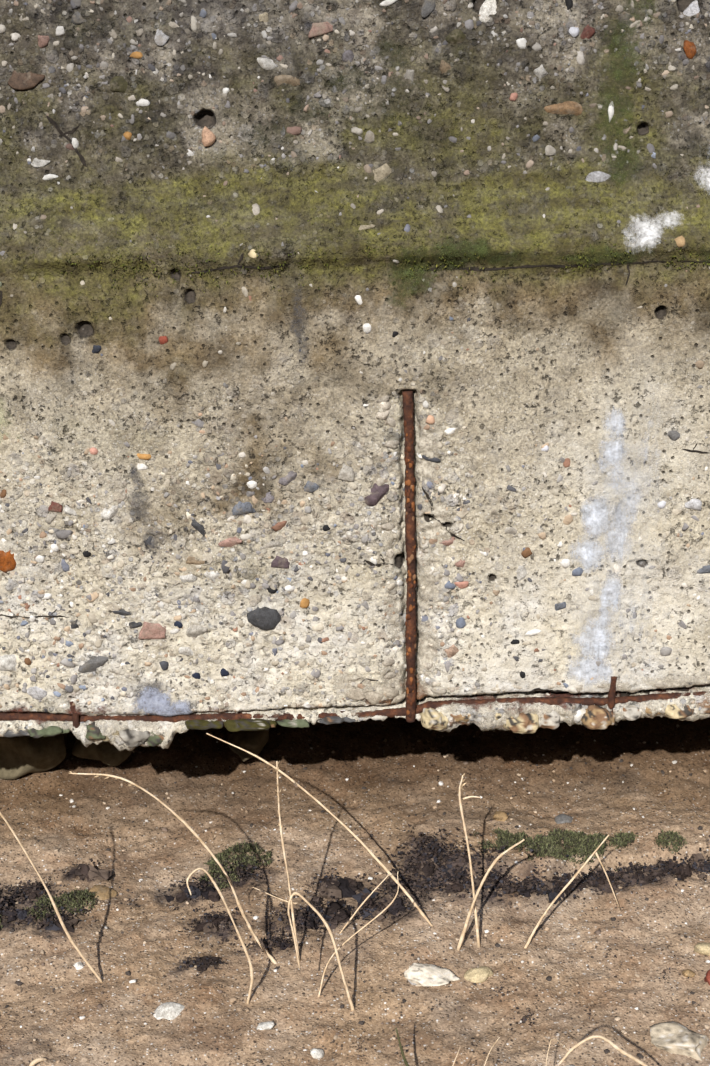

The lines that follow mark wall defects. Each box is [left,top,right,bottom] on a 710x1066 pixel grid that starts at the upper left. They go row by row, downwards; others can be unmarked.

damp [636,214,676,246]
spalling [180,395,710,734]
corrosion [443,694,494,711]
corrosion [545,690,588,709]
corrosion [0,707,82,724]
spalling [3,724,72,738]
spalling [85,720,164,748]